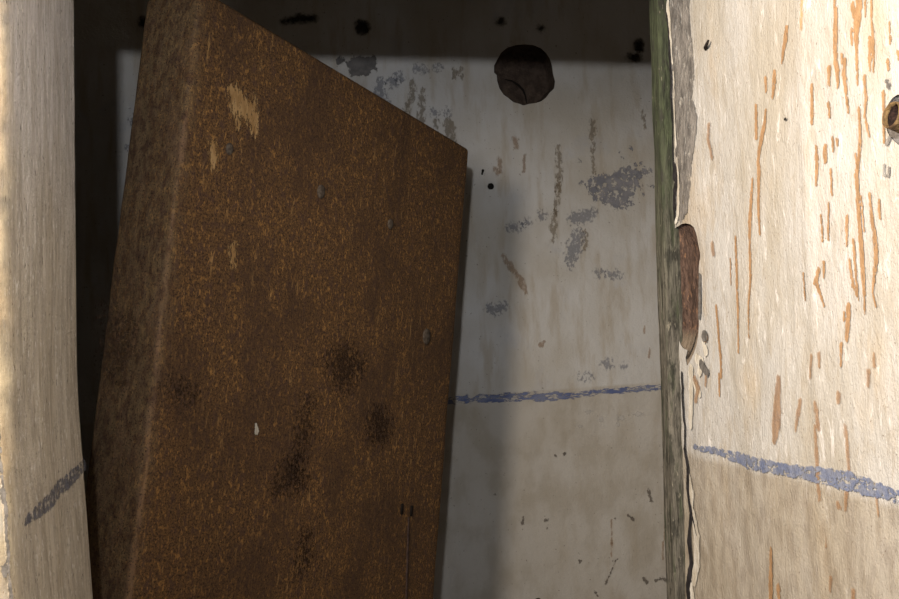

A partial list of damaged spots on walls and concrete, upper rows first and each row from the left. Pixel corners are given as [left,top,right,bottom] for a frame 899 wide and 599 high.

corrosion [764,25,788,100]
peeling [579,147,654,210]
corrosion [730,103,767,354]
corrosion [814,136,838,242]
corrosion [827,0,881,368]
spalling [885,129,899,146]
corrosion [802,260,825,308]
corrosion [704,304,722,397]
crack [681,371,697,599]
corrosion [772,376,781,444]
corrosion [813,401,821,502]